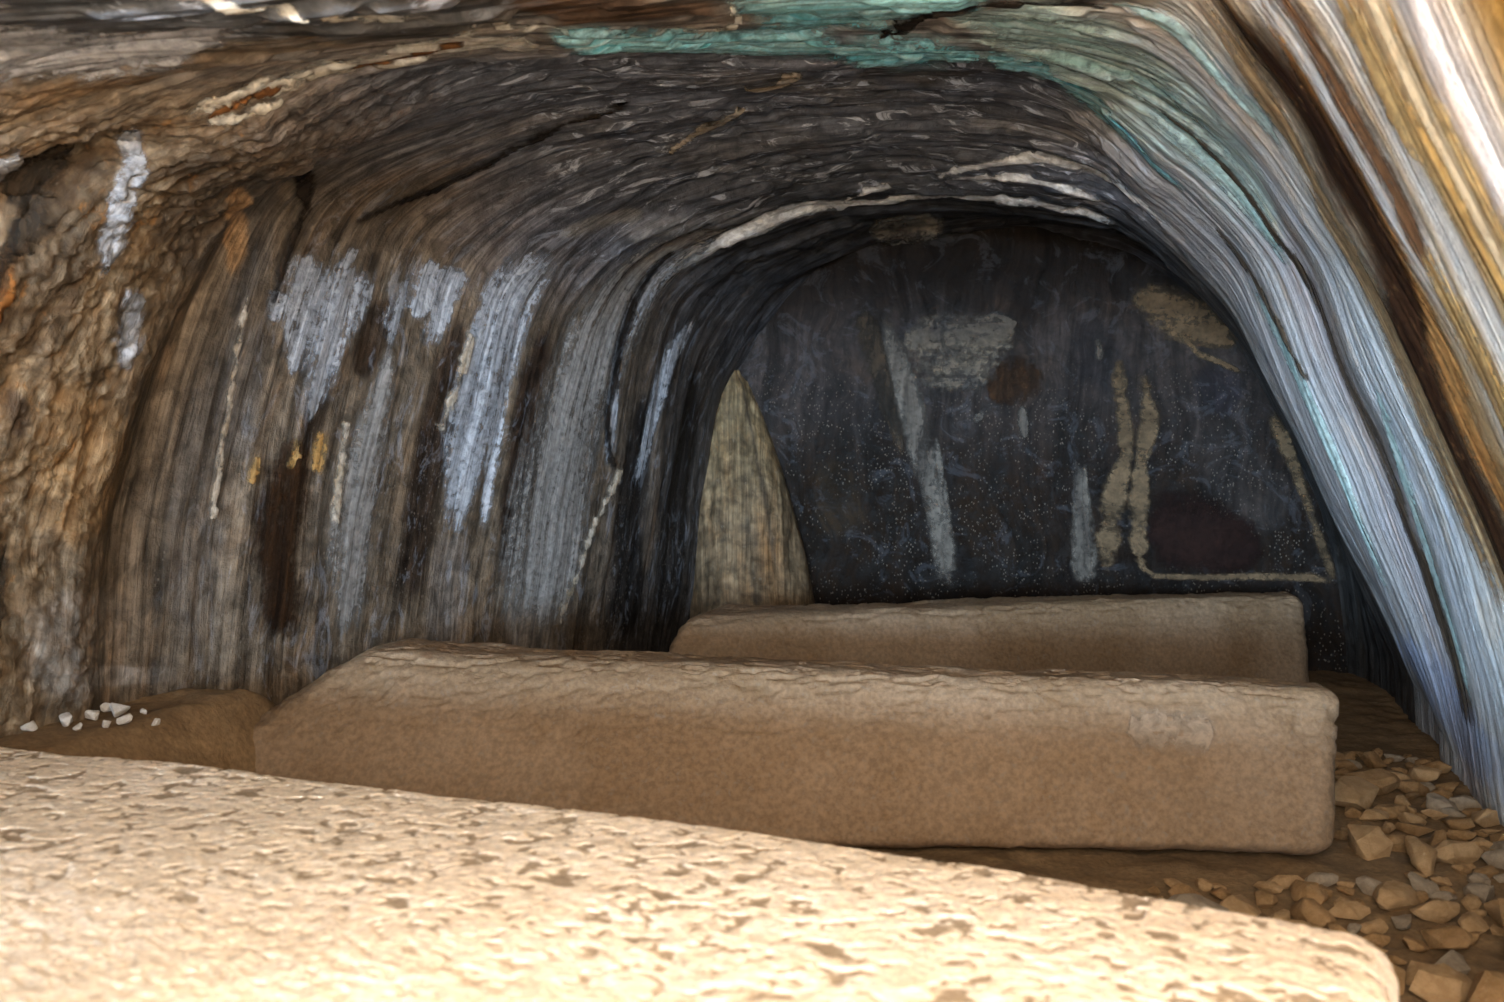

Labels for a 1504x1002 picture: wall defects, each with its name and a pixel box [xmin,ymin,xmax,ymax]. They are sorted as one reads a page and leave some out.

water stain [0,25,225,81]
water stain [0,144,74,255]
water stain [98,129,149,275]
corrosion [0,268,17,324]
water stain [118,292,146,370]
water stain [268,248,374,419]
water stain [329,260,469,628]
water stain [444,252,550,531]
water stain [605,245,690,462]
water stain [635,321,693,481]
water stain [857,311,954,579]
water stain [973,357,1043,438]